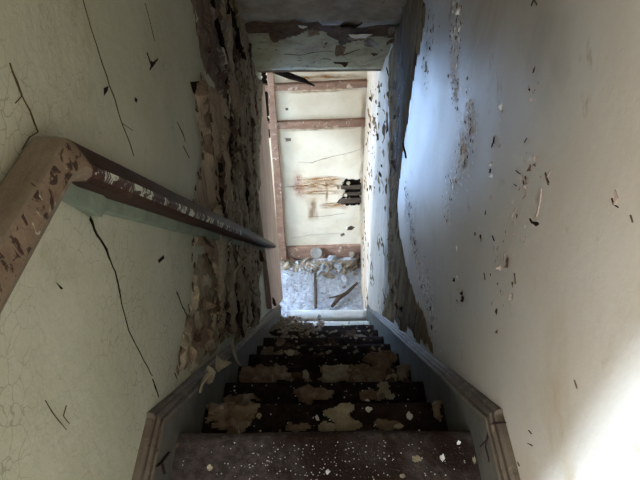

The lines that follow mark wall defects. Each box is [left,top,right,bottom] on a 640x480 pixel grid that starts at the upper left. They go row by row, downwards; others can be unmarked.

crack [9,63,39,150]
crack [83,0,134,156]
peeling [190,0,441,357]
peeling [440,0,479,225]
spalling [524,170,551,227]
crack [89,216,159,397]
peeling [174,235,410,413]